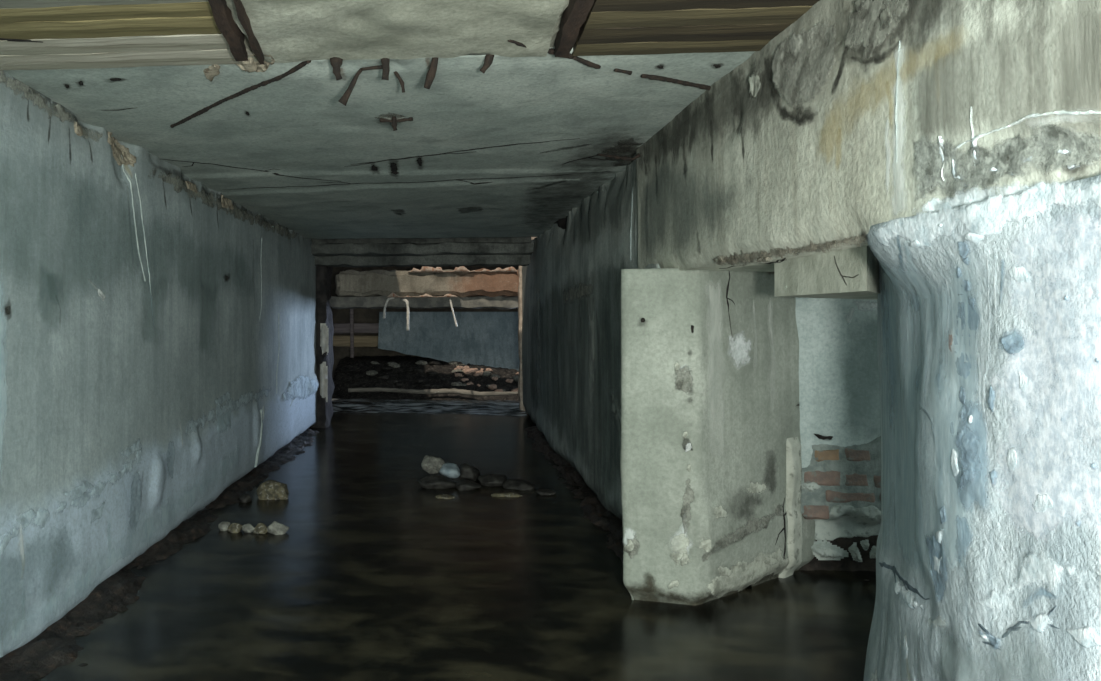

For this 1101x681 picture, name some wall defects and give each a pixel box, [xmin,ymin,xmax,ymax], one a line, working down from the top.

peeling [749,0,908,125]
spalling [0,70,136,167]
damp [640,58,773,193]
damp [121,155,154,323]
spalling [153,168,297,239]
peeling [708,125,1101,608]
spalling [623,536,639,558]
spalling [670,432,784,566]
crack [879,562,930,608]
spalling [978,614,1050,650]
peeling [1068,627,1101,647]